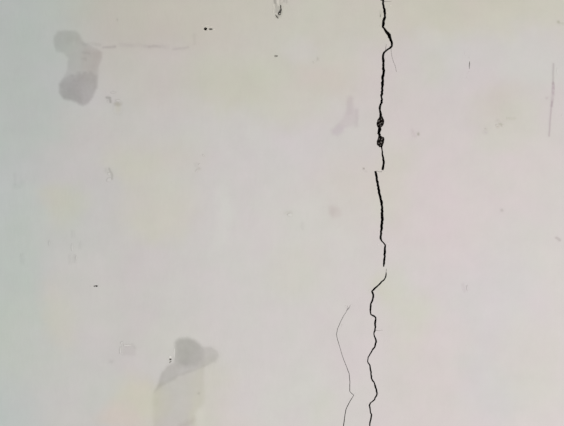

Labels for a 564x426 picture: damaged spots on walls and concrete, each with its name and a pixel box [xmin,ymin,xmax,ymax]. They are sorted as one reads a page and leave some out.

leakage [51,28,197,108]
crack [336,0,397,426]
leakage [149,336,221,426]